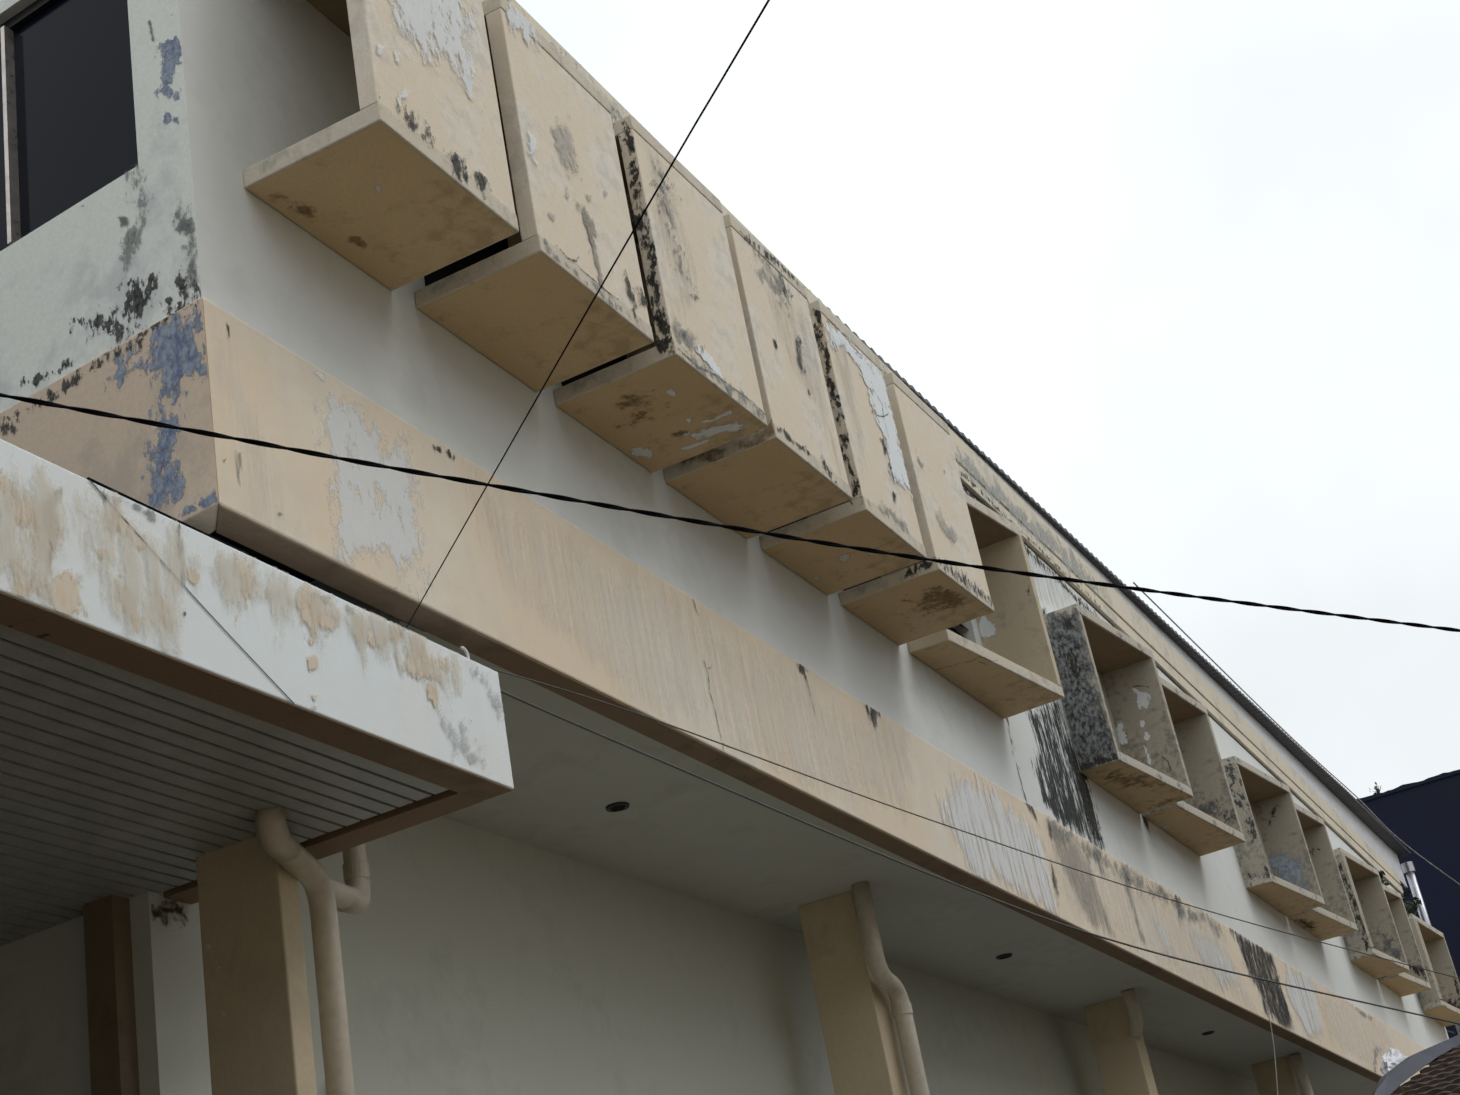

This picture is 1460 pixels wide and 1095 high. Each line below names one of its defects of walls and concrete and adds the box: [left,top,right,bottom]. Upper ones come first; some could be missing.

peeling [377,0,480,100]
mould [0,165,201,435]
peeling [104,306,217,516]
peeling [314,371,431,600]
peeling [679,410,748,450]
damp [544,106,910,540]
peeling [824,322,913,499]
peeling [12,558,88,616]
peeling [218,551,462,707]
damp [866,704,880,728]
damp [944,448,1295,1030]
peeling [936,769,1060,916]